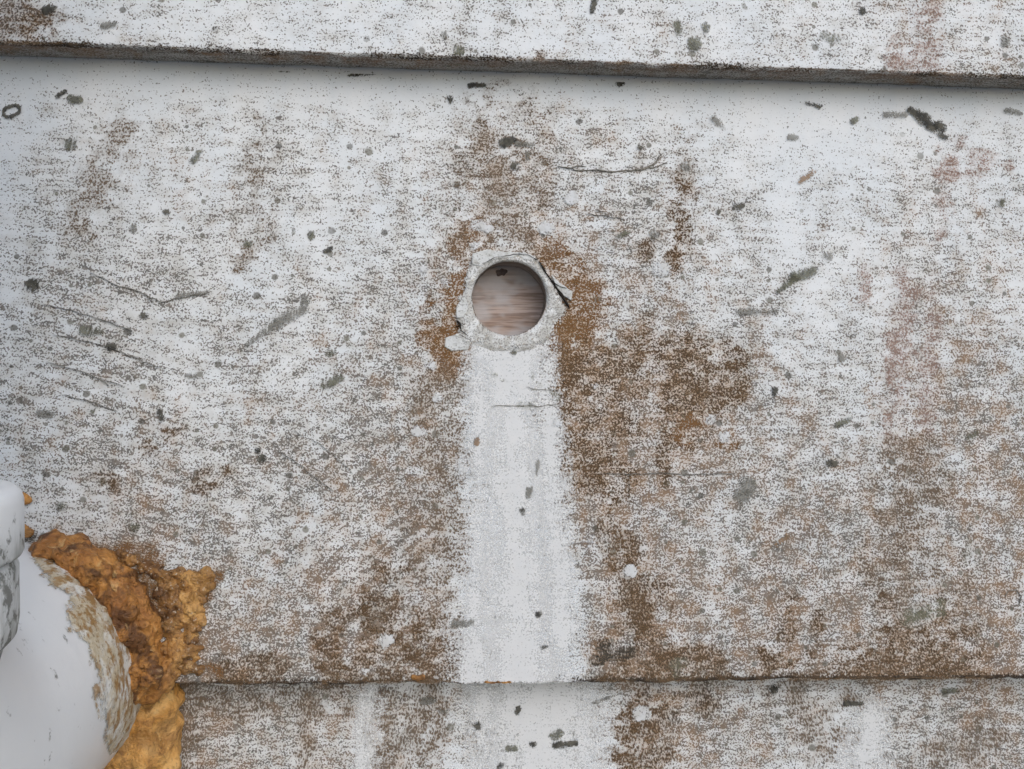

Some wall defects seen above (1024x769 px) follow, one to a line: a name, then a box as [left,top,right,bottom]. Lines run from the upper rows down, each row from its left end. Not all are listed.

crack [484,254,570,309]
damp [440,330,617,769]
damp [903,599,945,625]
damp [589,640,636,666]